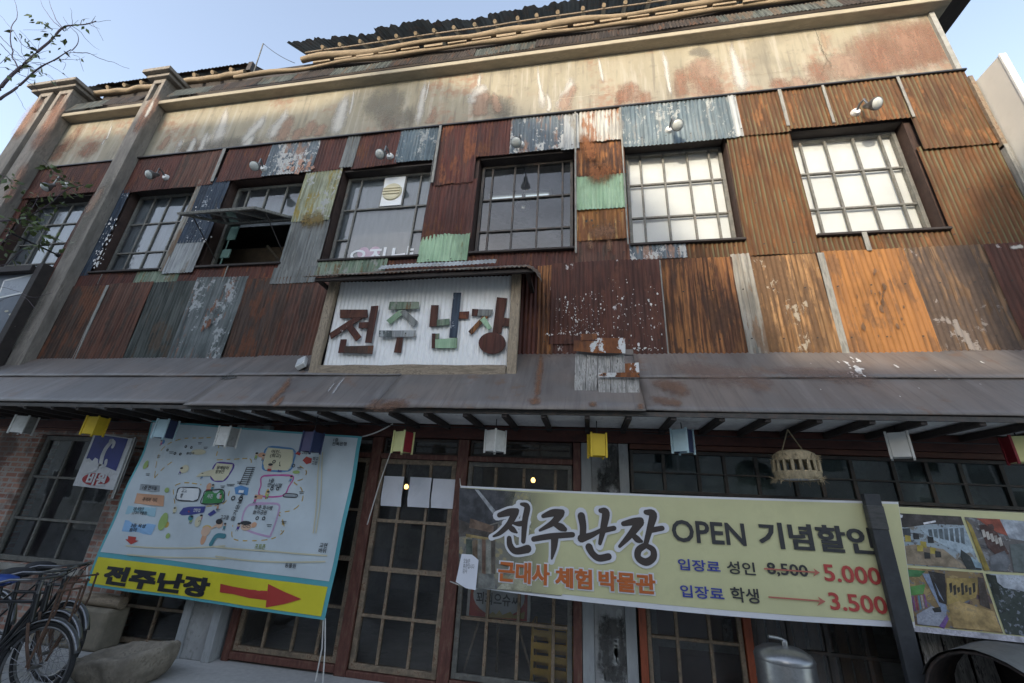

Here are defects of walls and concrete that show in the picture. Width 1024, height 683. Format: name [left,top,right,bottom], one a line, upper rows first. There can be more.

corrosion [472,92,502,116]
peeling [546,279,663,351]